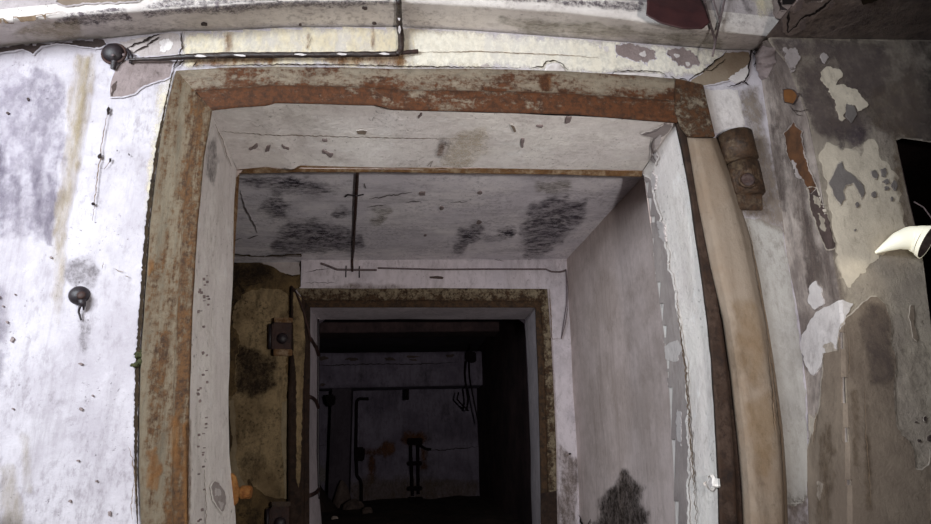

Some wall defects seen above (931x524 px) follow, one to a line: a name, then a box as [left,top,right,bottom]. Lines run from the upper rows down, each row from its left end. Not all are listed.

peeling [54,0,390,27]
crack [777,0,831,33]
peeling [0,31,183,98]
rust [539,75,551,91]
crack [671,51,727,80]
crack [731,47,758,86]
spalling [783,122,898,251]
water stain [242,177,363,257]
water stain [500,183,585,256]
water stain [231,263,271,320]
spalling [807,295,931,524]
water stain [598,470,648,524]